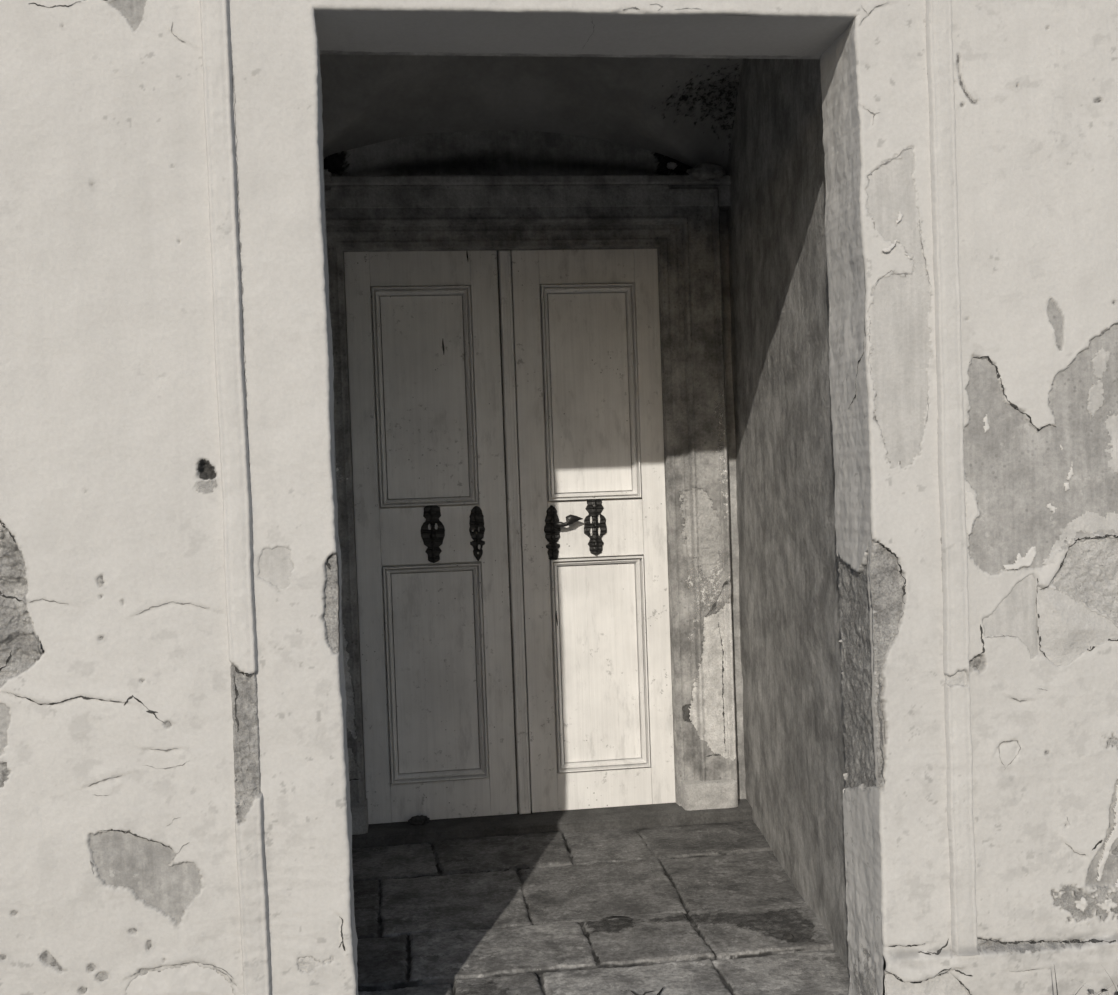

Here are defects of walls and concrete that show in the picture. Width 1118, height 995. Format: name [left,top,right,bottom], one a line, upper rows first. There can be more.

water stain [654,64,740,152]
flaking render [865,146,933,469]
spalling [197,459,216,480]
flaking render [963,323,1118,624]
flaking render [0,520,43,685]
crack [15,695,190,796]
spalling [230,663,261,823]
peeling [682,577,736,761]
spalling [838,539,906,788]
flaking render [90,829,202,923]
flaking render [1051,780,1118,922]
crack [883,938,972,995]